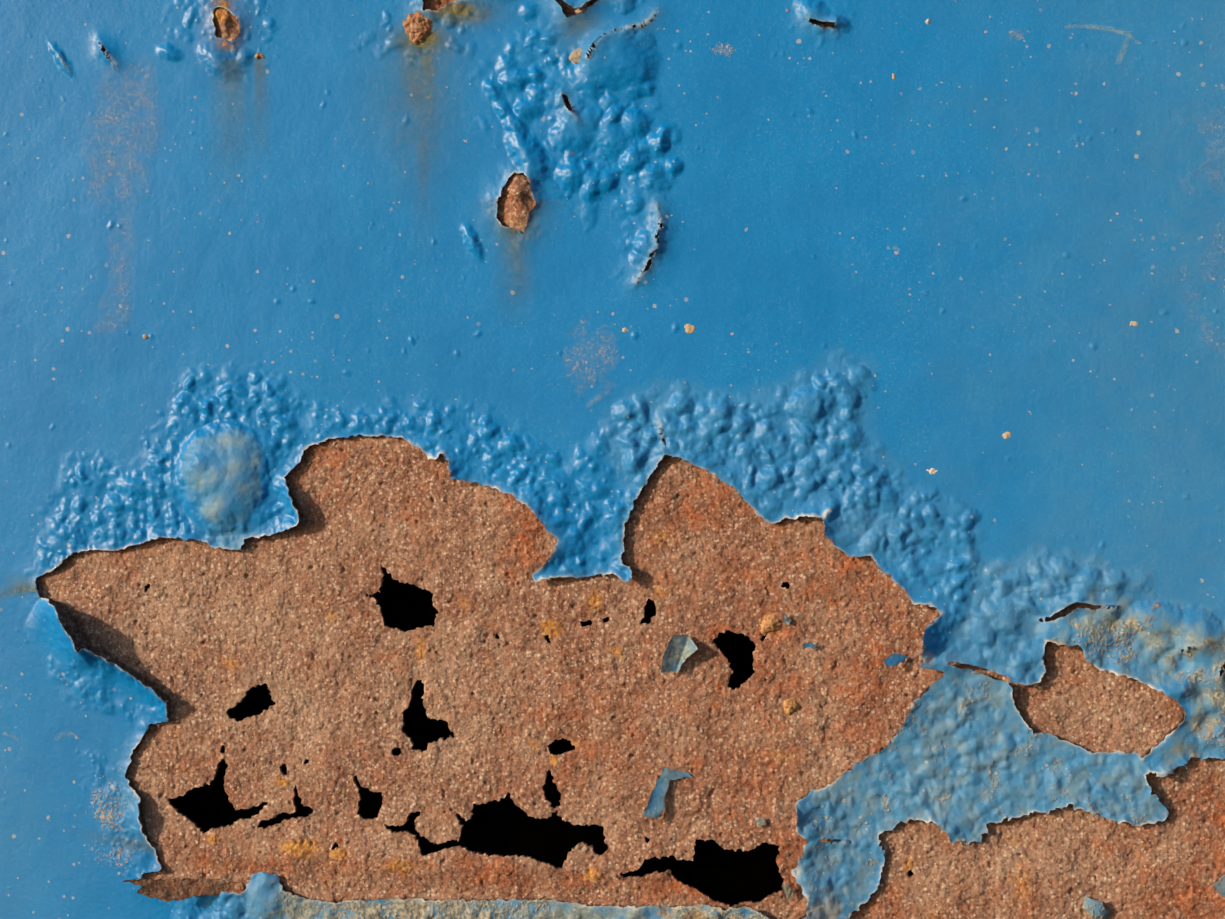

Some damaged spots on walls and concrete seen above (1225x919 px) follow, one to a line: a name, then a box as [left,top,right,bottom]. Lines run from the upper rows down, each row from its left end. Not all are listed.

peeling [206,0,249,52]
peeling [408,0,514,25]
crack [545,0,664,126]
crack [799,6,845,37]
peeling [487,161,548,248]
crack [628,195,669,290]
peeling [22,420,1225,919]